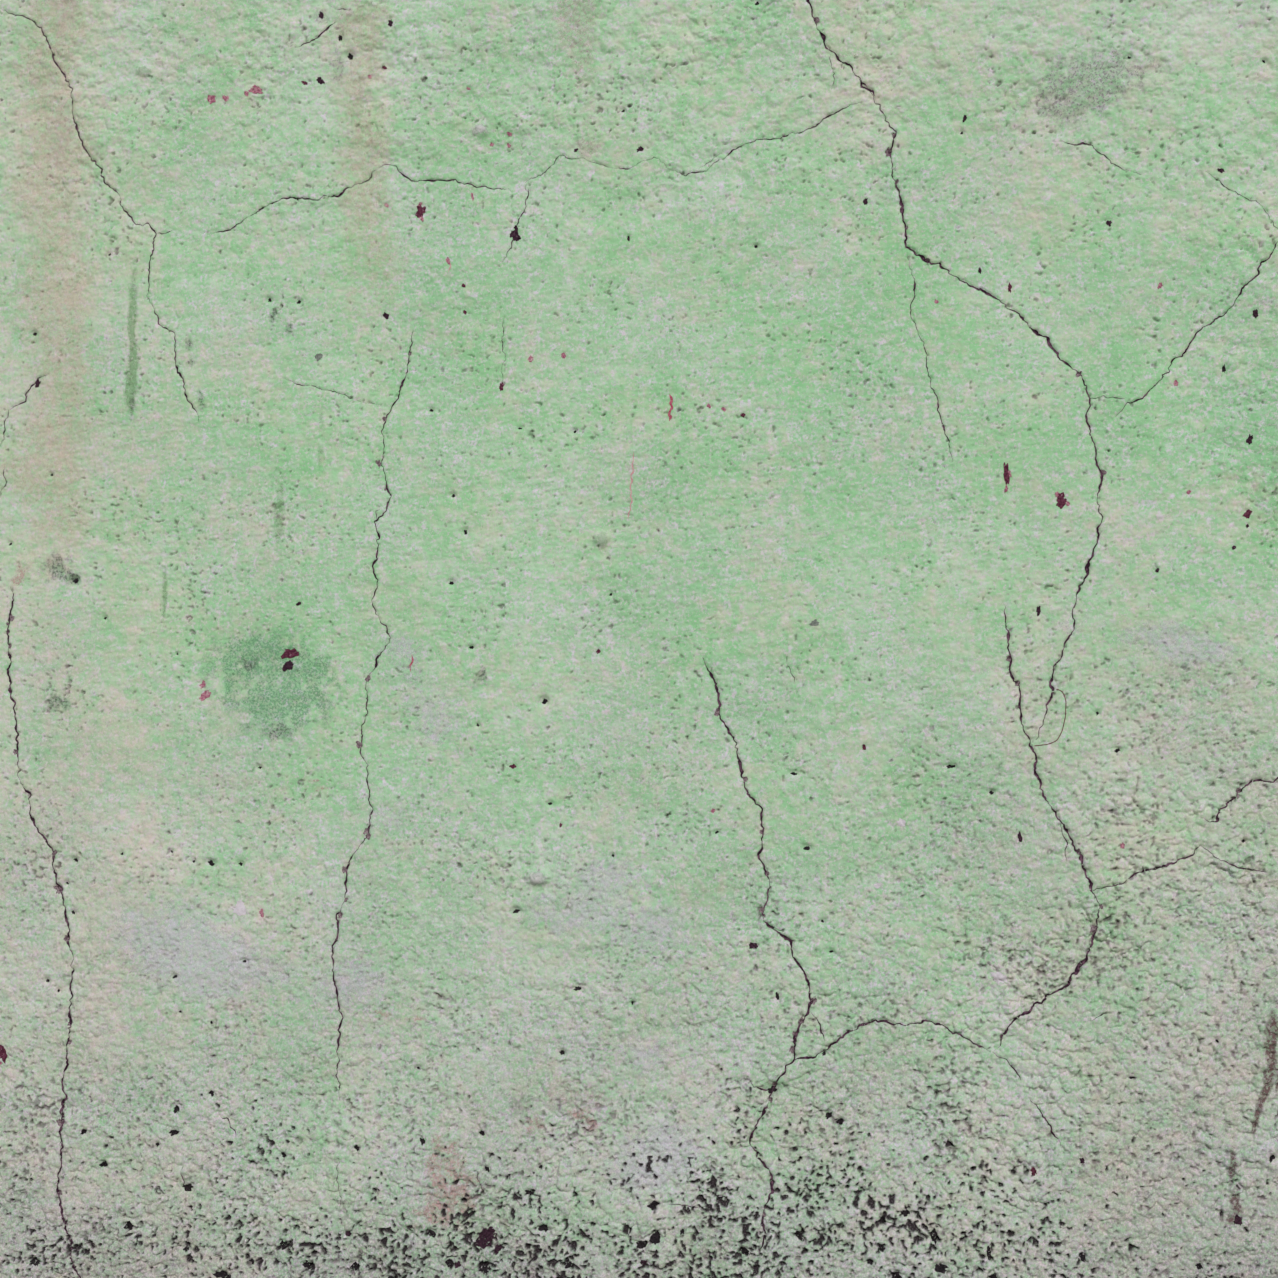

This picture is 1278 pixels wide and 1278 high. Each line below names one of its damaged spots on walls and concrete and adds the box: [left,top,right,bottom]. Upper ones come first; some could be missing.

crack [5,10,199,421]
crack [212,164,501,234]
crack [6,591,81,1278]
crack [290,332,413,1098]
leakage [2,1112,1109,1278]
crack [502,0,1278,1252]